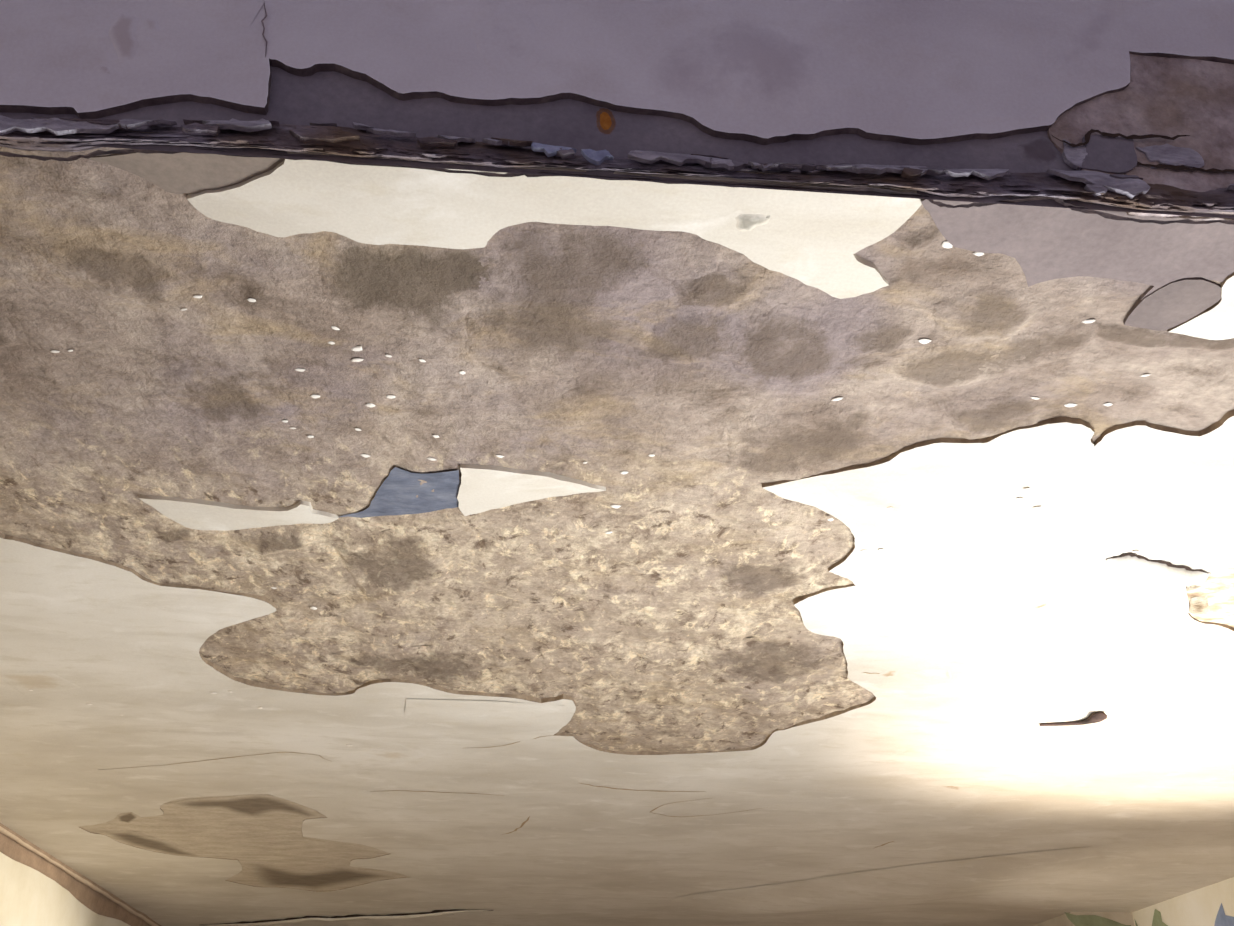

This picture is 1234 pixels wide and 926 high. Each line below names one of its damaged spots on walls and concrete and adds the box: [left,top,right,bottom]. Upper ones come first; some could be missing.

corrosion [595,107,616,135]
flaking render [0,51,1234,755]